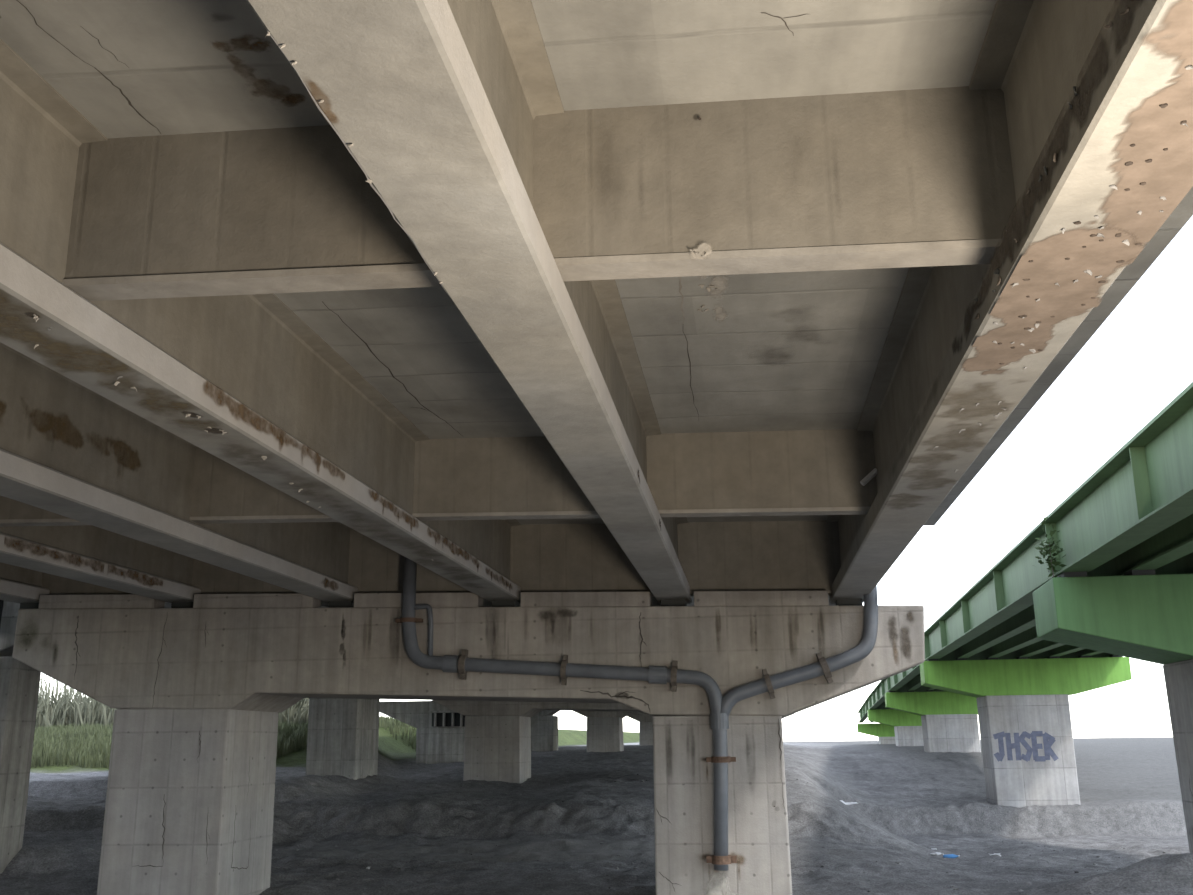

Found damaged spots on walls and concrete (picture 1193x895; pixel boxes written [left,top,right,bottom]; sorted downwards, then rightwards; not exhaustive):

crack [17,0,160,132]
peeling [952,0,1193,375]
peeling [0,294,227,434]
crack [324,304,461,435]
rust [4,538,163,586]
crack [580,612,651,713]
damp [889,612,913,659]